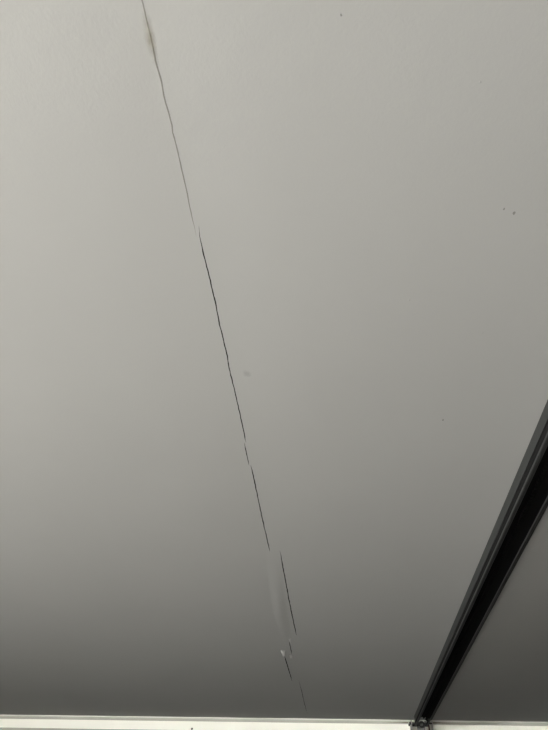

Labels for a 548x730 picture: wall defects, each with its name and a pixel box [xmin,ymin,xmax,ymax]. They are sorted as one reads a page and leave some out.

crack [141,0,306,708]